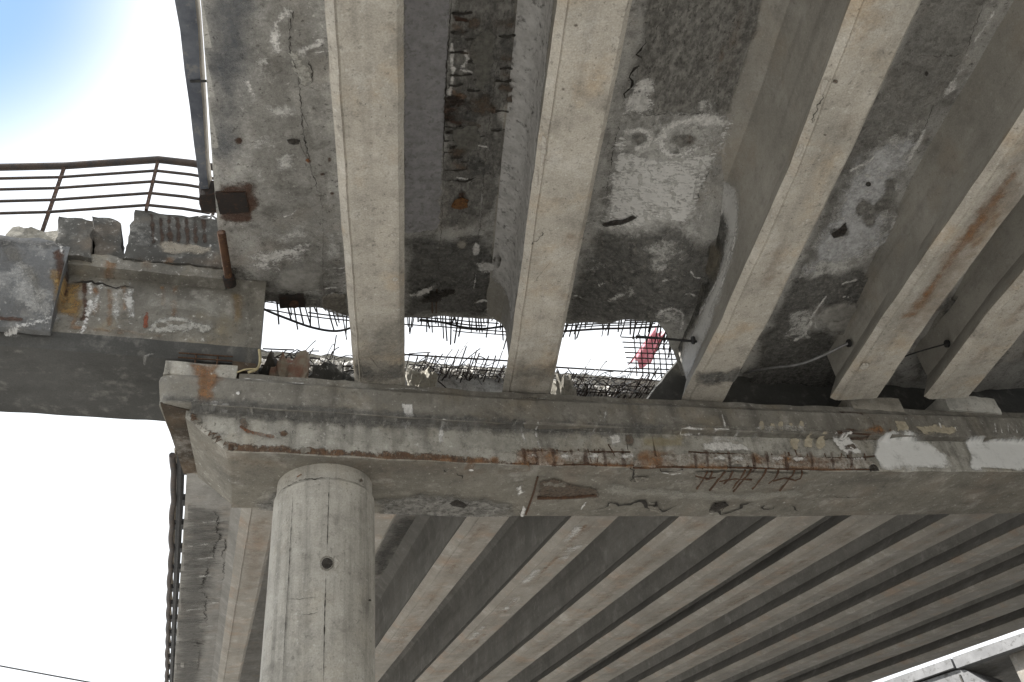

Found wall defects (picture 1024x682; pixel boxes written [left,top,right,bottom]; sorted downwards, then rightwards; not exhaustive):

crack [288,8,324,290]
crack [605,39,717,208]
corrosion [221,184,257,222]
leakage [567,0,995,387]
corrosion [52,246,110,328]
crack [73,280,129,289]
corrosion [192,364,218,400]
spalling [261,293,354,374]
spalling [405,286,508,388]
spalling [554,320,676,399]
spalling [191,413,879,515]
crack [590,433,683,513]